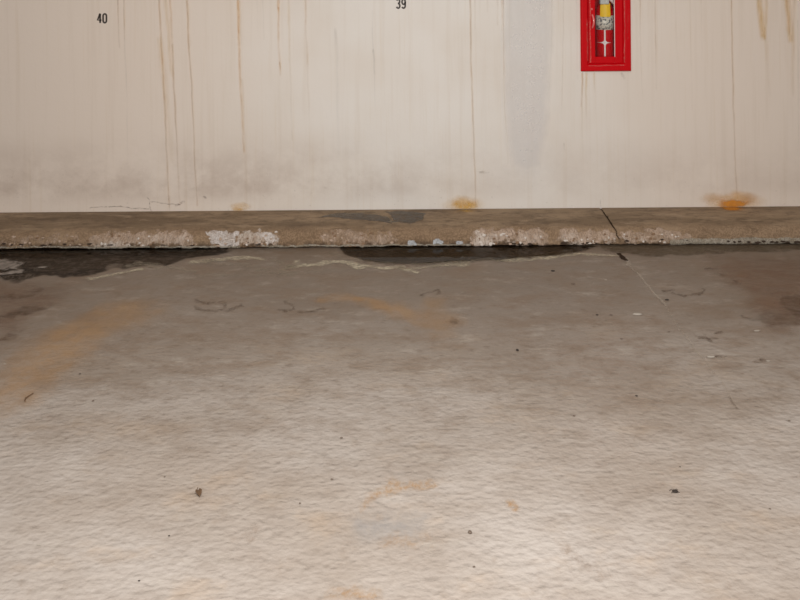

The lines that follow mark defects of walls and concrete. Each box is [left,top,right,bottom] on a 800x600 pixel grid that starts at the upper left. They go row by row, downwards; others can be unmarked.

rust [723,200,745,210]
crack [602,210,629,262]
water stain [0,247,264,281]
water stain [283,243,800,273]